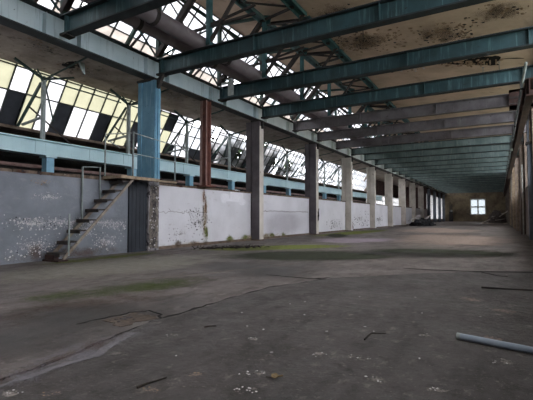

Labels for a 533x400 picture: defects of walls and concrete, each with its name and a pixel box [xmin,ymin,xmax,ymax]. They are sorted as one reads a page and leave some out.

leakage [464,0,529,26]
flaking render [149,186,159,249]
crack [0,275,330,380]